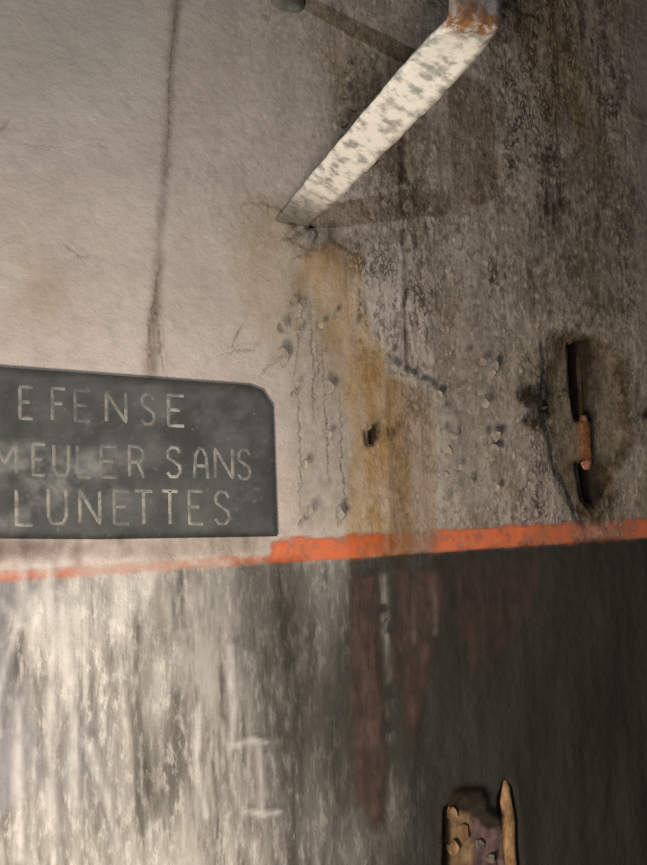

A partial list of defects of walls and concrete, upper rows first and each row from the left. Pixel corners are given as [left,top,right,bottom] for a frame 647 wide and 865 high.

spalling [447,780,517,865]